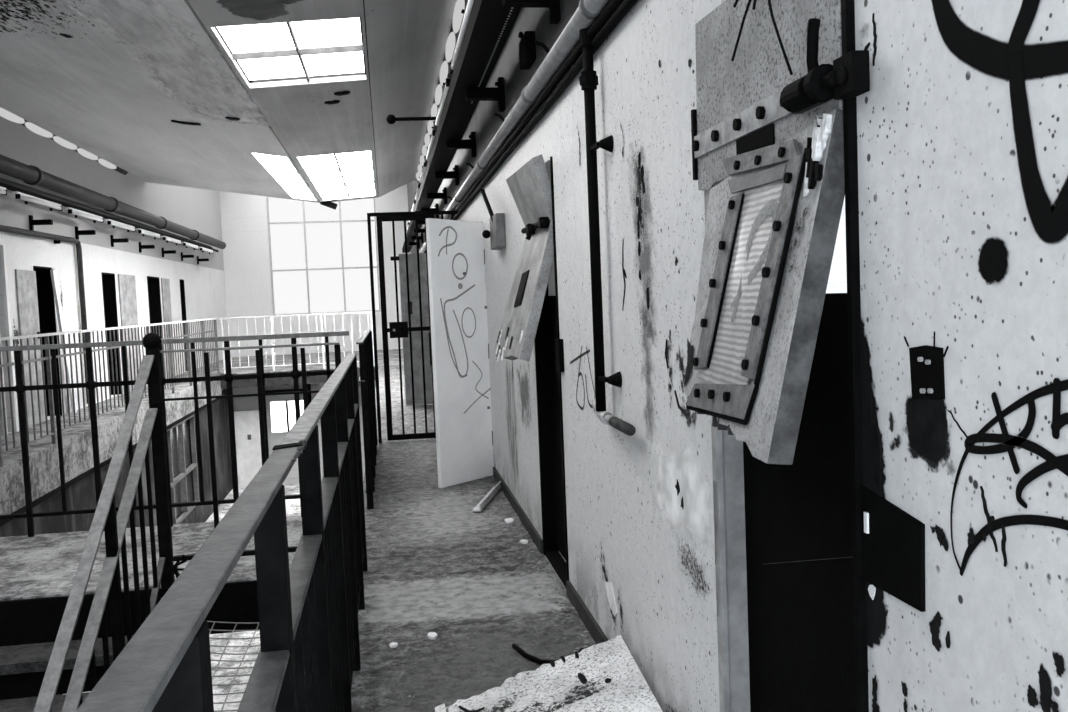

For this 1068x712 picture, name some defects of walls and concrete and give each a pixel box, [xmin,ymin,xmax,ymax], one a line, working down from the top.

damp [0,0,262,123]
damp [217,0,303,20]
damp [634,152,653,432]